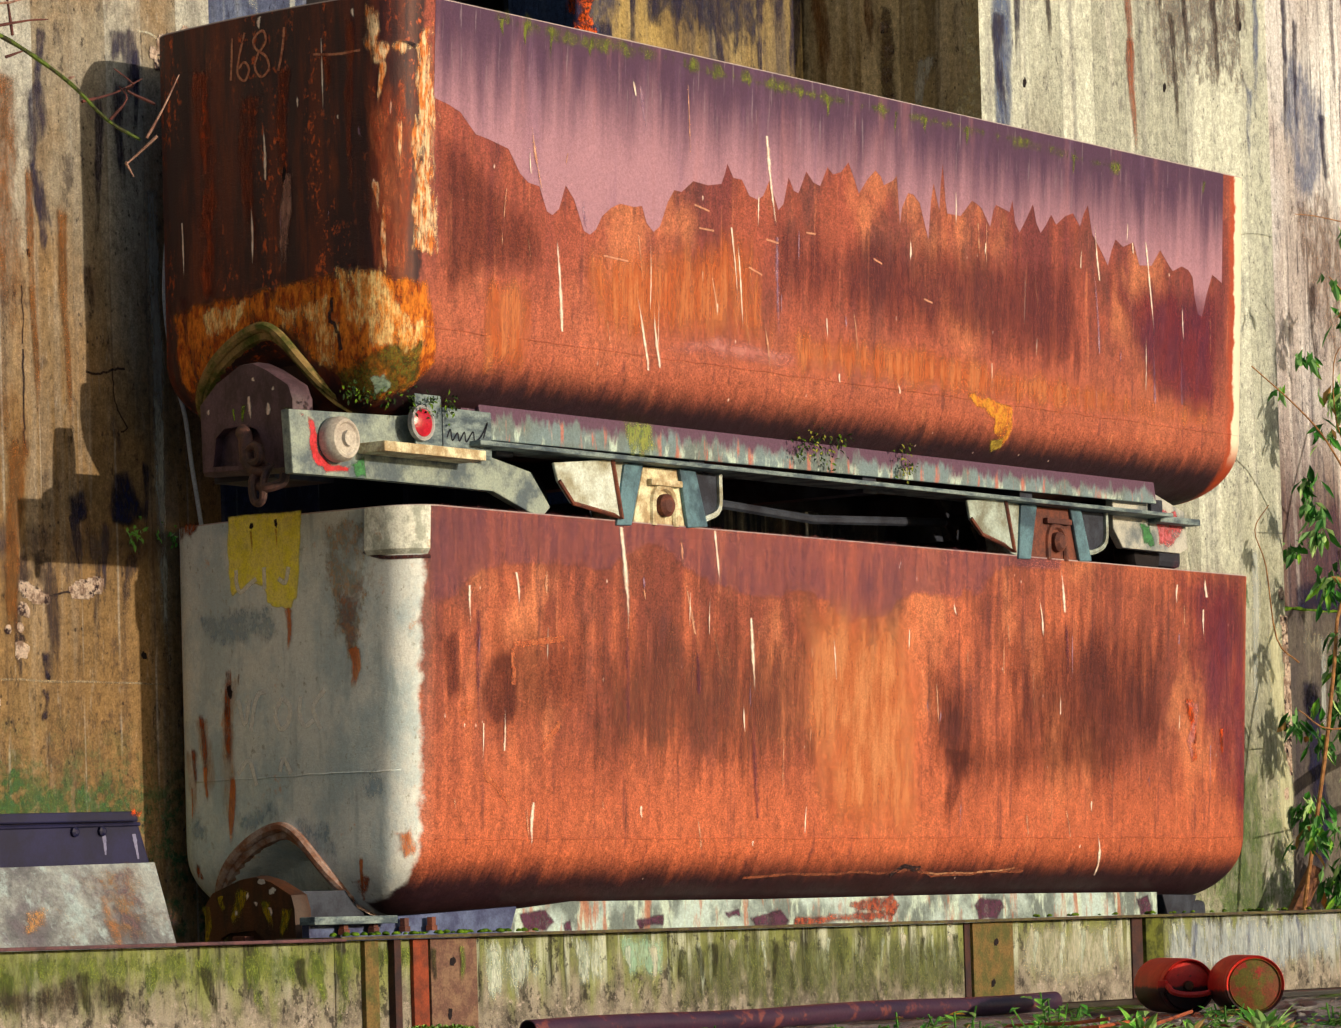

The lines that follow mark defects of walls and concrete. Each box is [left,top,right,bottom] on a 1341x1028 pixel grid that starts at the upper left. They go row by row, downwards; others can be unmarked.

rust [0,74,40,386]
leakage [27,28,52,246]
rust [57,211,72,397]
leakage [95,29,140,201]
rust [568,0,601,34]
leakage [579,0,801,71]
rust [1125,0,1137,135]
leakage [1149,0,1258,115]
leakage [1281,0,1341,391]
rust [6,442,28,622]
leakage [0,528,60,653]
leakage [487,942,537,995]